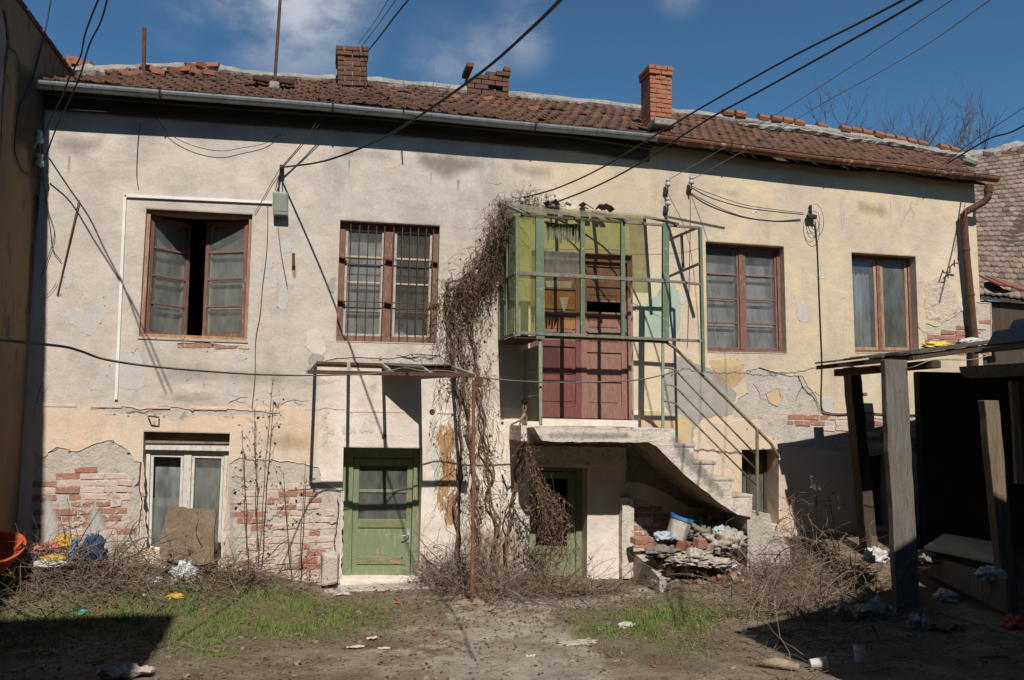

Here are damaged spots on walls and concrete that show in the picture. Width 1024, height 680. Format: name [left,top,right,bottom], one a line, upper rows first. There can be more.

spalling [924,296,993,357]
peeling [429,417,443,496]
spalling [639,355,850,484]
crack [753,367,819,411]
spalling [865,416,884,456]
spalling [27,439,148,565]
spalling [222,457,344,586]